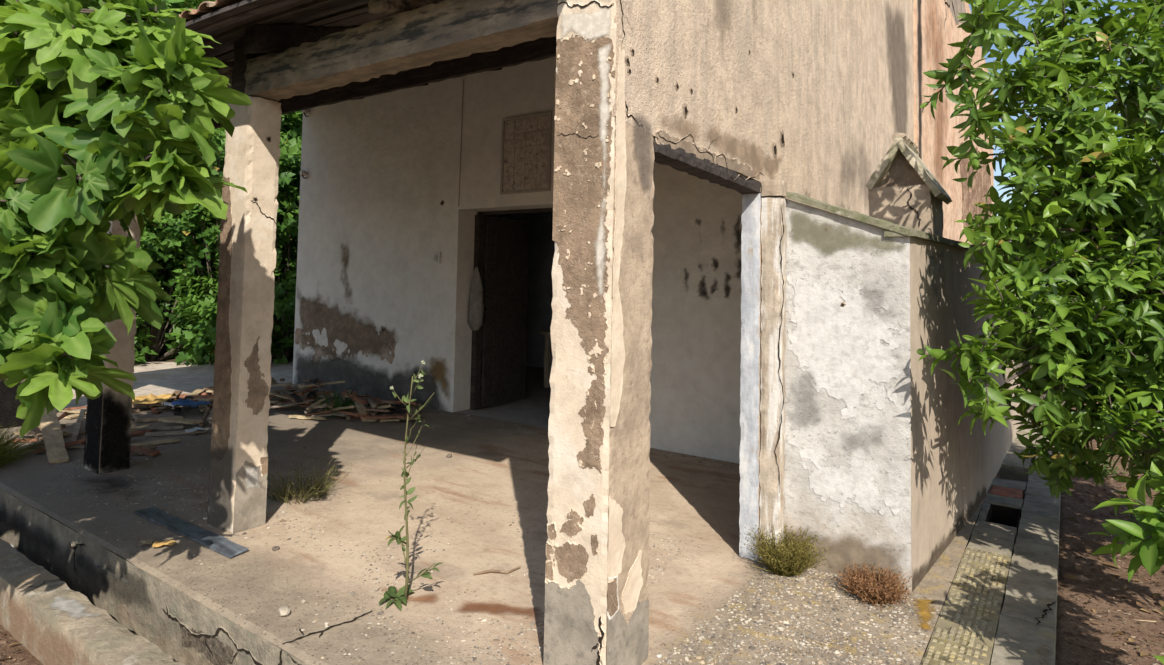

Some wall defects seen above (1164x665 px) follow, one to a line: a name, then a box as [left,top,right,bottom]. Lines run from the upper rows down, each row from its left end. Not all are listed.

crack [556,0,633,49]
crack [625,101,762,181]
crack [902,188,921,226]
flaking render [211,176,269,452]
flaking render [295,325,397,364]
peeling [787,274,905,419]
peeling [788,440,903,515]
crack [163,603,372,665]
flaking render [543,494,649,665]
crack [1034,601,1056,625]